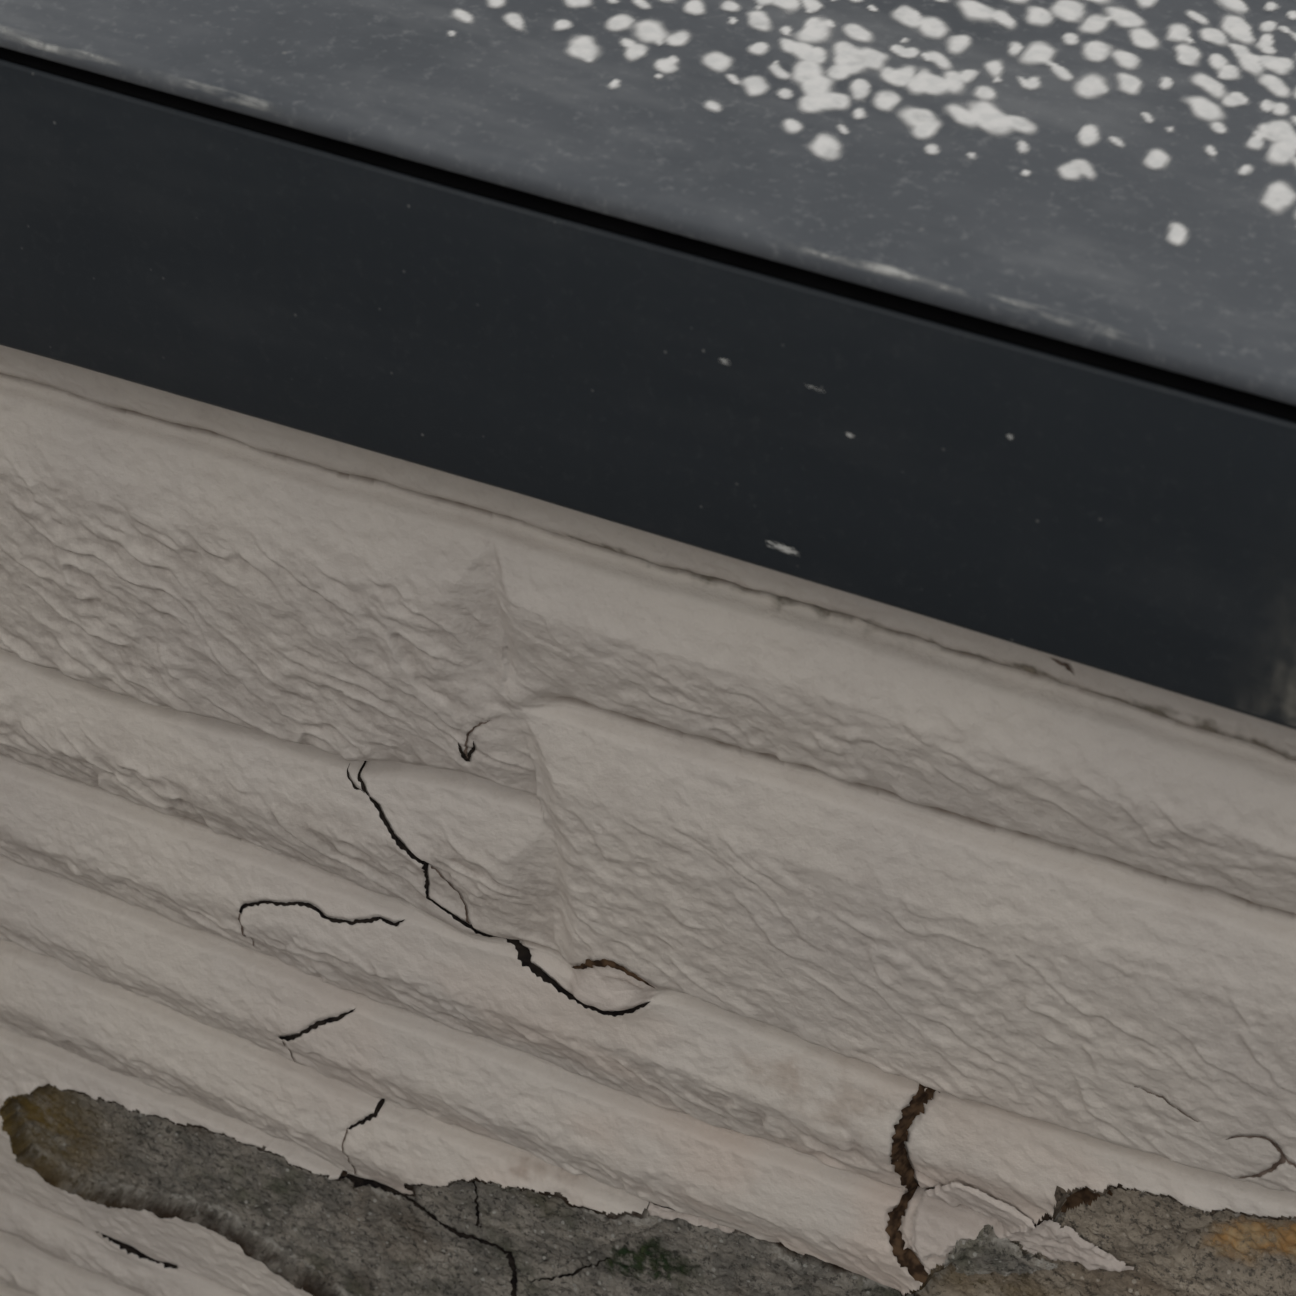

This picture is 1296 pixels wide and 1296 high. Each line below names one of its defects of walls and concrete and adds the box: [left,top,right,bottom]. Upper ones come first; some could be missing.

crack [458,720,492,762]
crack [238,900,404,946]
crack [347,761,649,1017]
crack [279,1008,356,1062]
crack [336,1098,609,1296]
spalling [0,1084,1296,1296]
crack [885,1084,940,1283]